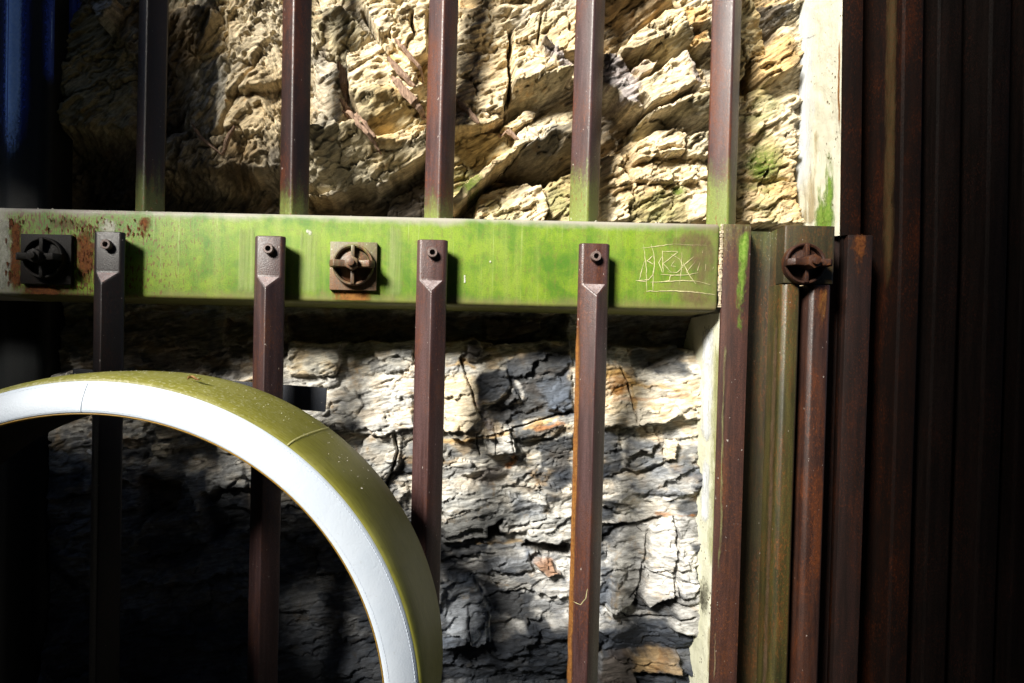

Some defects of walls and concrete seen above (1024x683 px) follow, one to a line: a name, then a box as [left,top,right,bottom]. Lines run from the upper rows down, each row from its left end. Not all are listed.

rust [883,0,896,272]
rust [5,215,94,295]
rust [127,217,149,237]
rust [855,236,865,262]